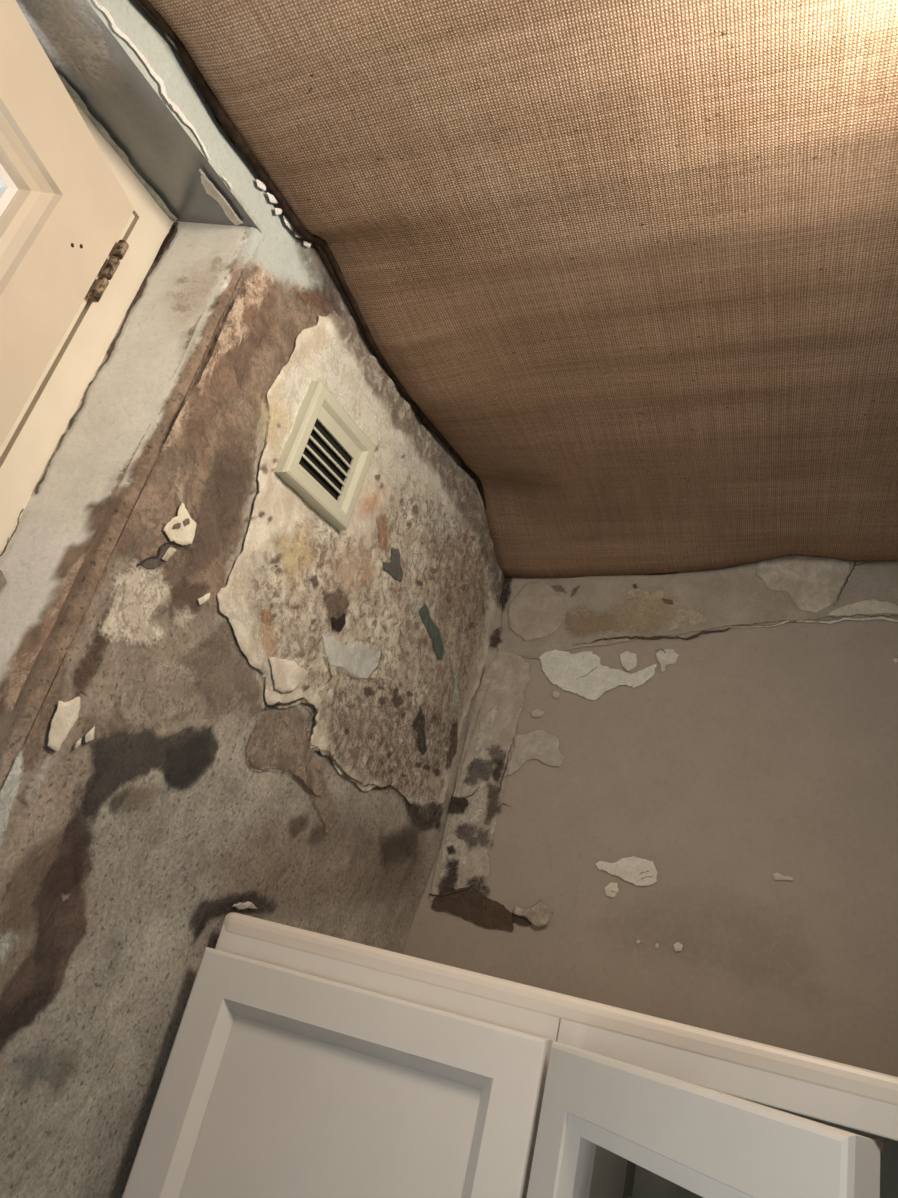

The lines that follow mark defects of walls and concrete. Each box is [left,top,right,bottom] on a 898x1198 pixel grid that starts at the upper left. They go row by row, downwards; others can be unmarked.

peeling [94,0,243,225]
peeling [256,179,311,248]
peeling [196,264,275,392]
spalling [0,509,24,590]
damp [5,551,89,710]
peeling [83,435,145,558]
damp [96,245,514,931]
peeling [101,290,898,900]
crack [573,562,898,646]
peeling [48,697,95,752]
damp [0,613,261,1050]
damp [191,891,277,939]